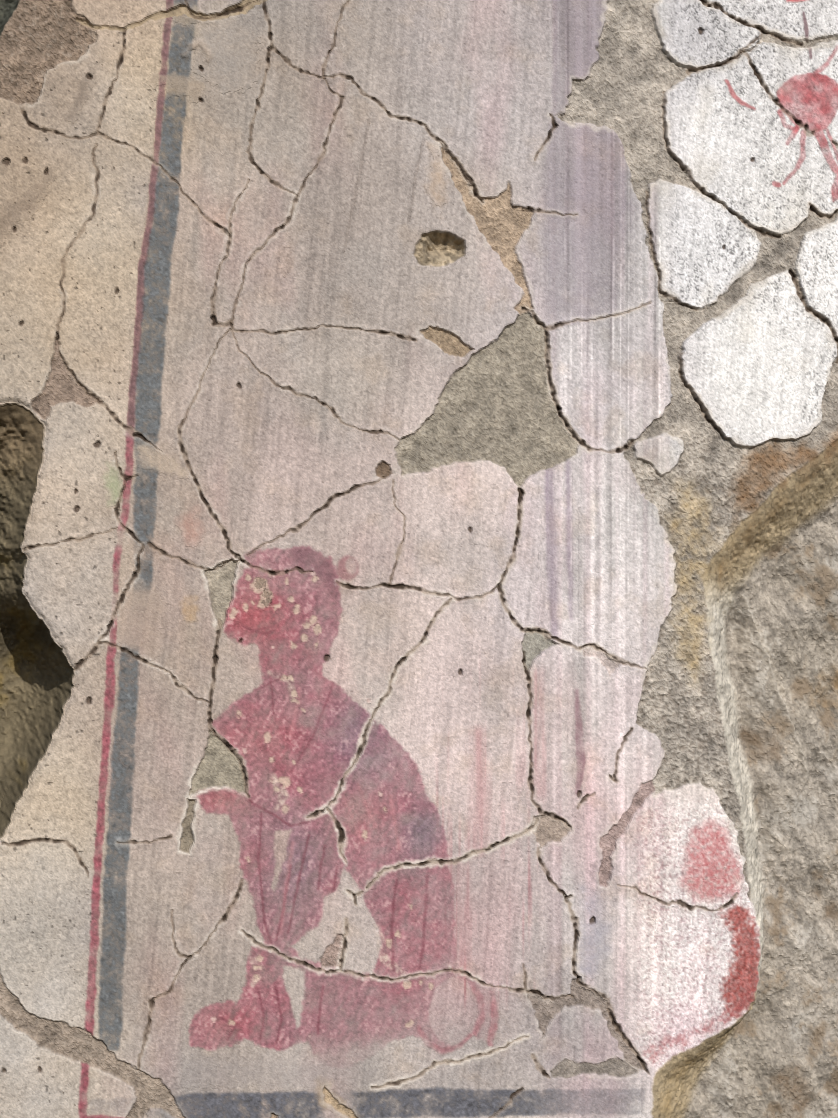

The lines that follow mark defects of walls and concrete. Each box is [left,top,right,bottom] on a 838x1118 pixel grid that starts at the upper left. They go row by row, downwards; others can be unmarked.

spalling [0,0,98,105]
spalling [376,146,580,489]
crack [521,192,699,455]
spalling [557,0,838,903]
crack [21,0,651,1076]
spalling [205,561,330,662]
spalling [180,731,248,854]
peeling [270,761,304,815]
crack [1,839,89,879]
crack [618,885,738,913]
spalling [0,974,185,1118]
crack [371,1036,551,1118]